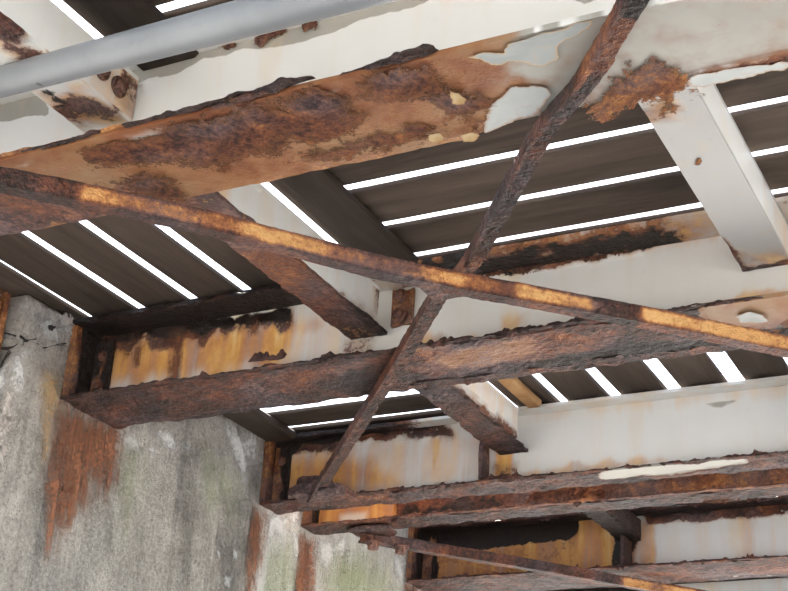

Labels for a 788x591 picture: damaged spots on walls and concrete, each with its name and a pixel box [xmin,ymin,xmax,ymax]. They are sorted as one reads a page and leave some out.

corrosion [254,29,287,48]
peeling [469,20,592,67]
peeling [450,91,467,105]
corrosion [581,56,704,124]
corrosion [20,49,493,203]
peeling [460,85,551,142]
peeling [663,300,736,312]
corrosion [672,296,763,309]
peeling [736,312,768,323]
crack [0,332,67,368]
corrosion [228,349,287,375]
corrosion [603,461,683,471]